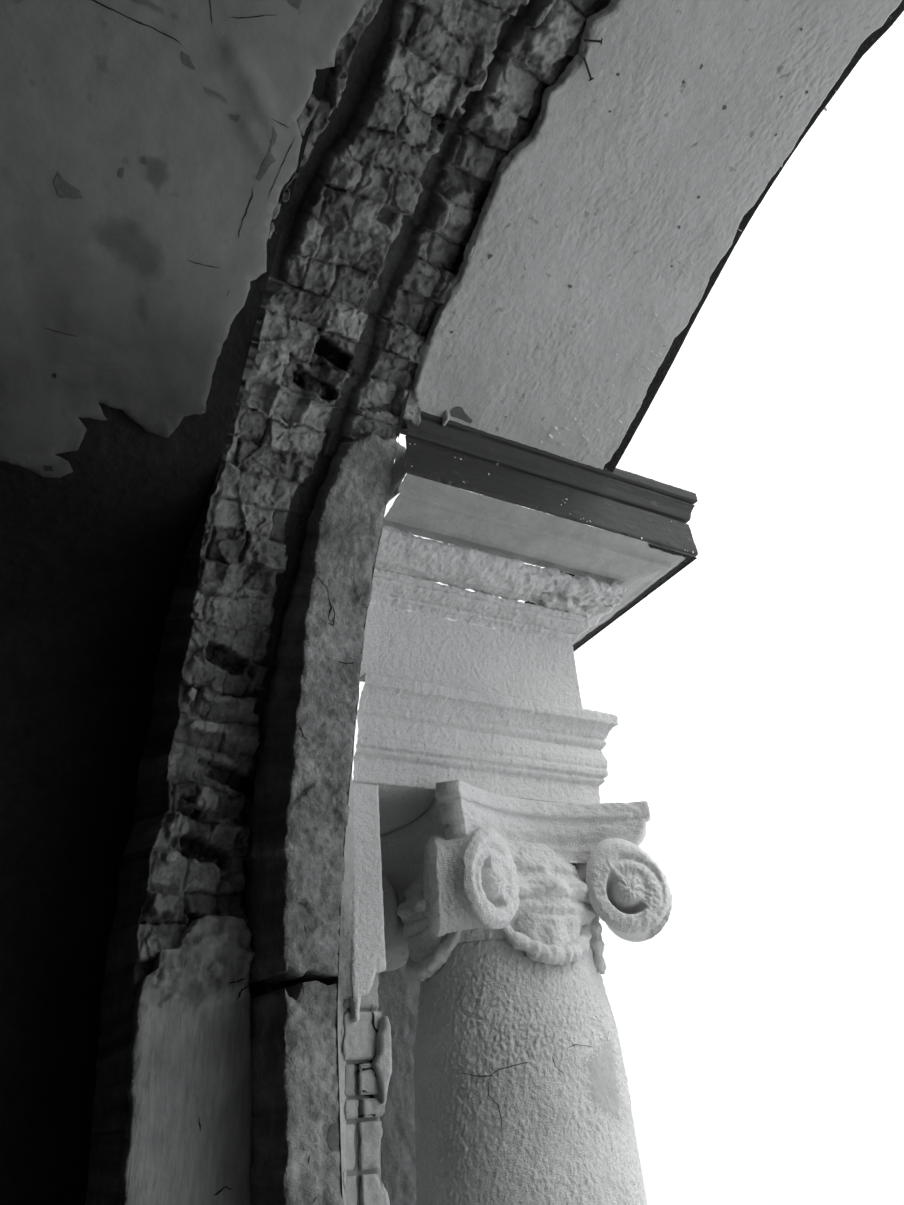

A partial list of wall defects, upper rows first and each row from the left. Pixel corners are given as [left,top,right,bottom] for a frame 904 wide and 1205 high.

crack [92,0,182,45]
flaking render [85,0,623,1205]
crack [460,1044,591,1129]